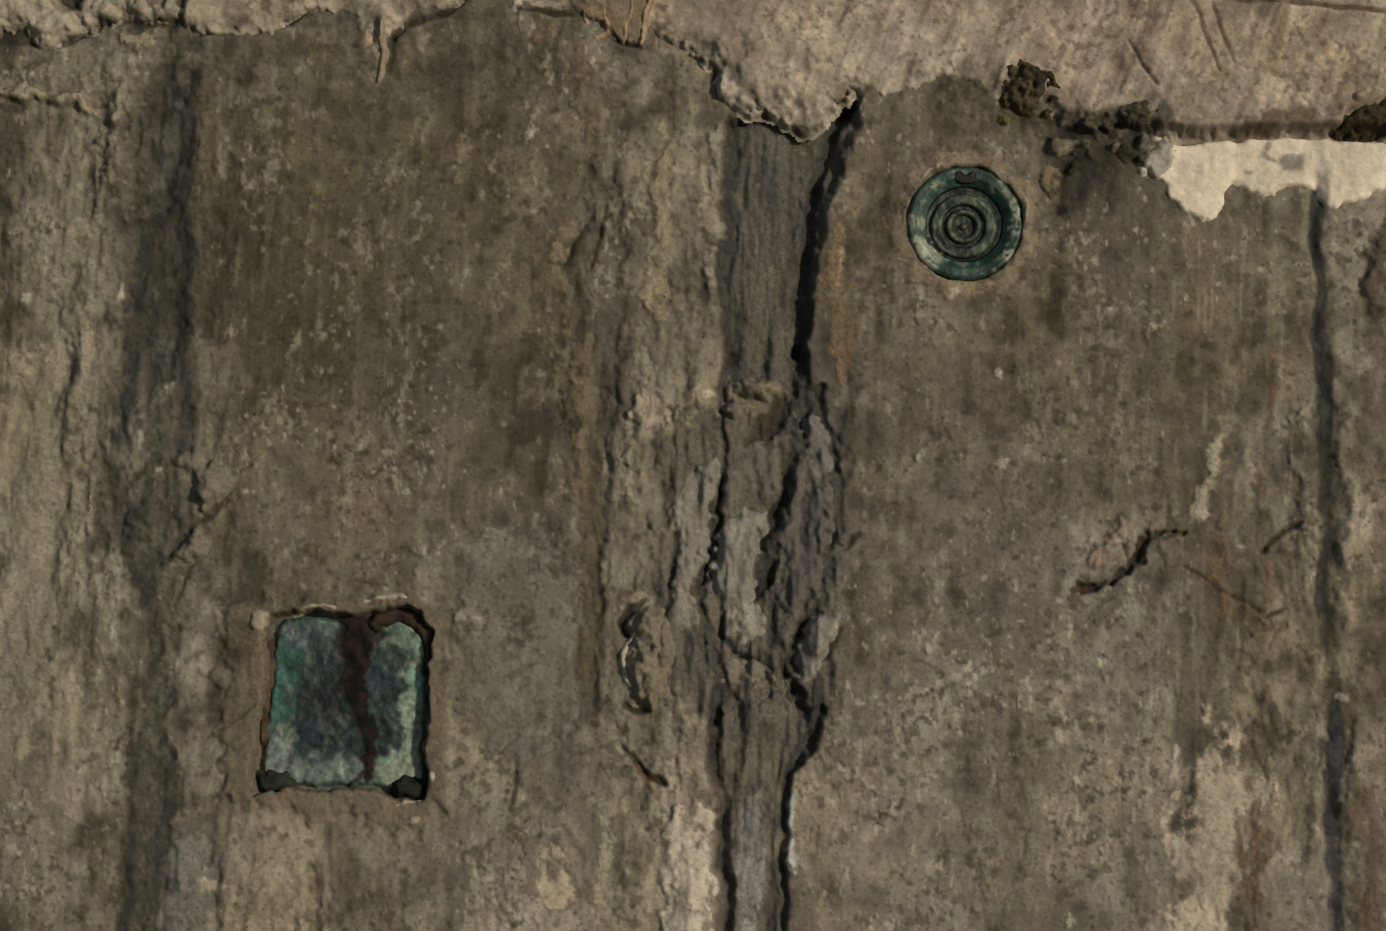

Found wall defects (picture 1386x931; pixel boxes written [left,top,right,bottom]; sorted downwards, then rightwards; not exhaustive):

flaking render [0,71,130,184]
flaking render [119,32,149,51]
leakage [696,113,780,773]
leakage [755,94,859,888]
crack [1071,533,1158,594]
leakage [1310,191,1334,653]
crack [622,746,666,798]
leakage [1307,694,1346,931]